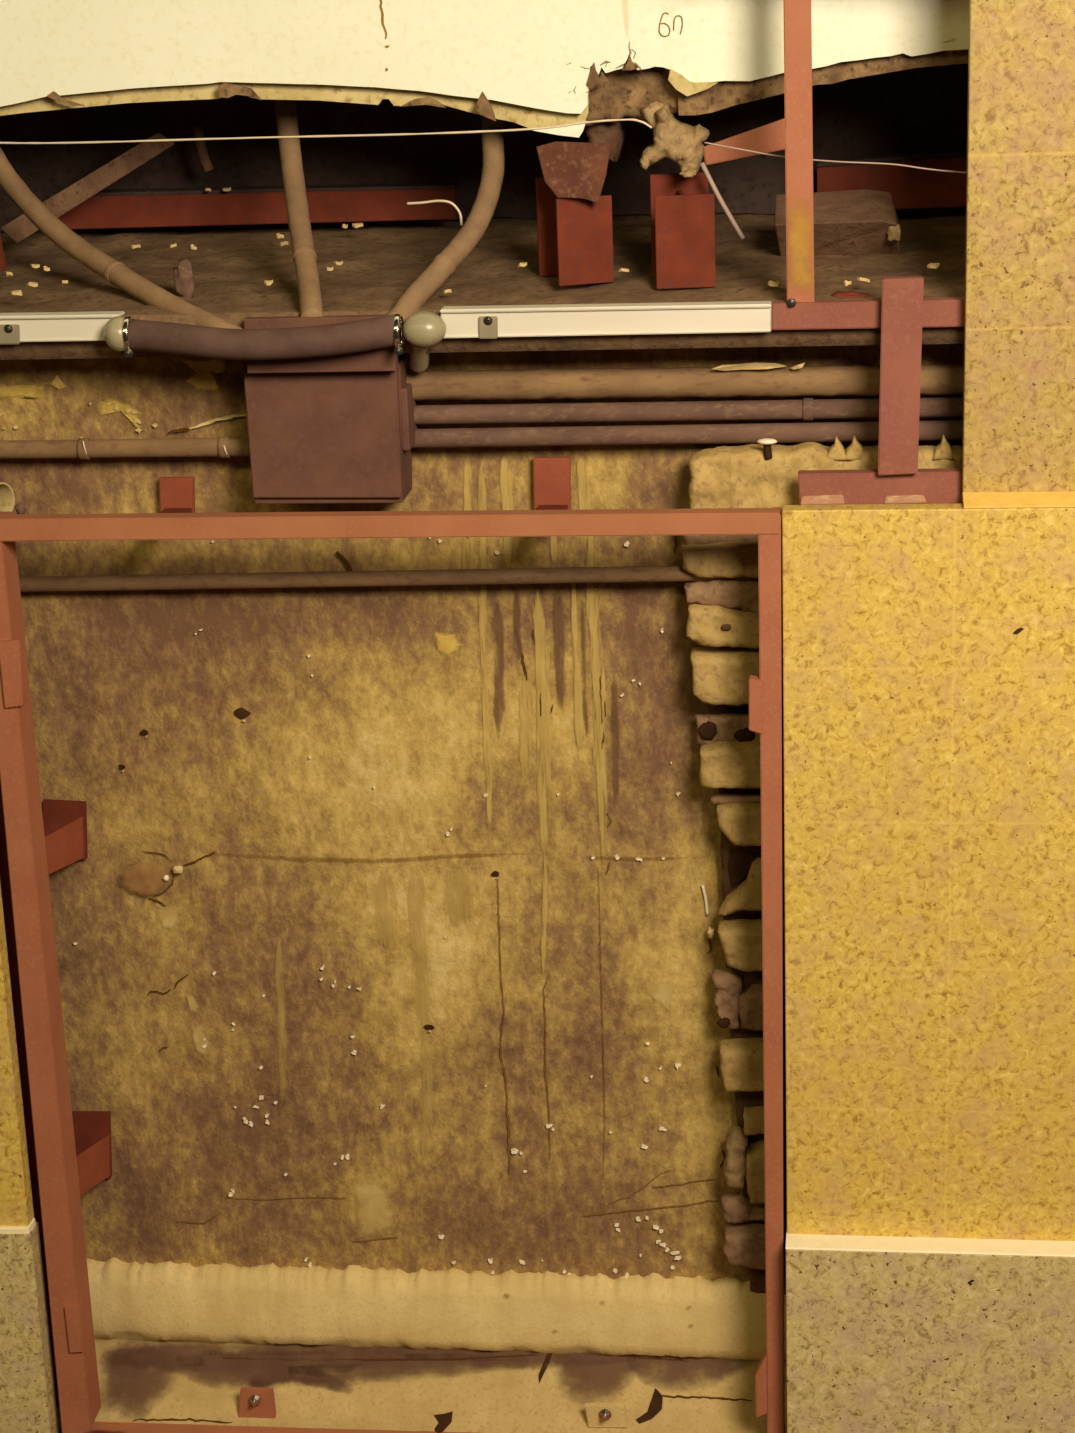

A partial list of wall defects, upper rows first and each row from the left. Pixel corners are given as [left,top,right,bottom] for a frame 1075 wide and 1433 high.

spalling [0,56,784,162]
spalling [812,49,969,86]
damp [464,457,513,511]
damp [462,536,620,970]